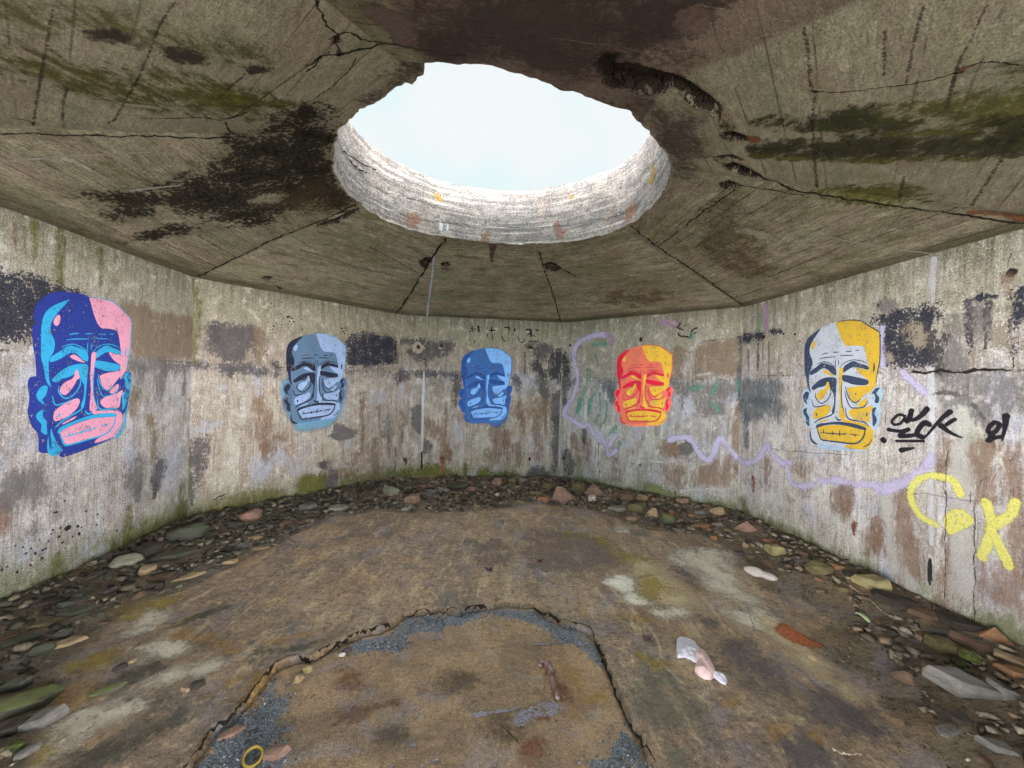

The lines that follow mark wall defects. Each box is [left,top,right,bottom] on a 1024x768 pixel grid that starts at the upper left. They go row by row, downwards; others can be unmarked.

crack [1,111,249,139]
leakage [76,101,356,245]
crack [304,0,467,99]
spalling [593,52,763,190]
leakage [745,103,1024,163]
crack [809,61,1022,93]
crack [181,151,1024,366]
crack [912,357,1015,375]
crack [183,604,487,768]
crack [533,589,656,763]